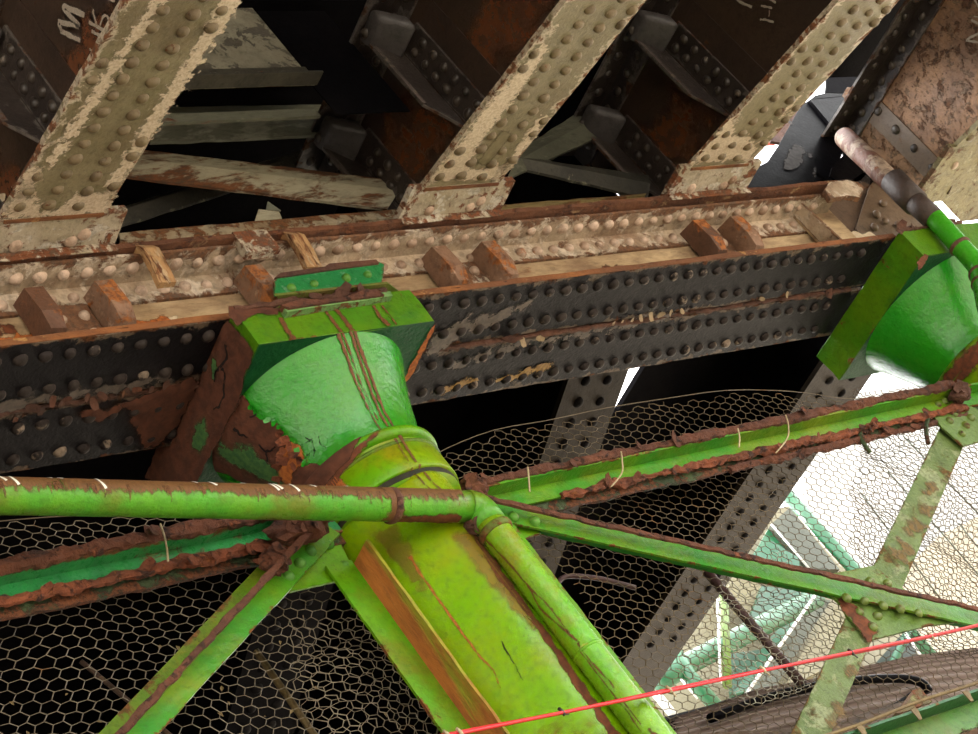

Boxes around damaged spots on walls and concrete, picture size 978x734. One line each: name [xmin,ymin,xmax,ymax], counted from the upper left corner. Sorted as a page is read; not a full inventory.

peeling [0,0,242,219]
peeling [427,299,533,356]
peeling [445,308,696,370]
peeling [0,374,174,416]
rust [0,290,657,734]
rust [488,495,978,612]
rust [888,474,951,565]
rust [838,598,879,642]